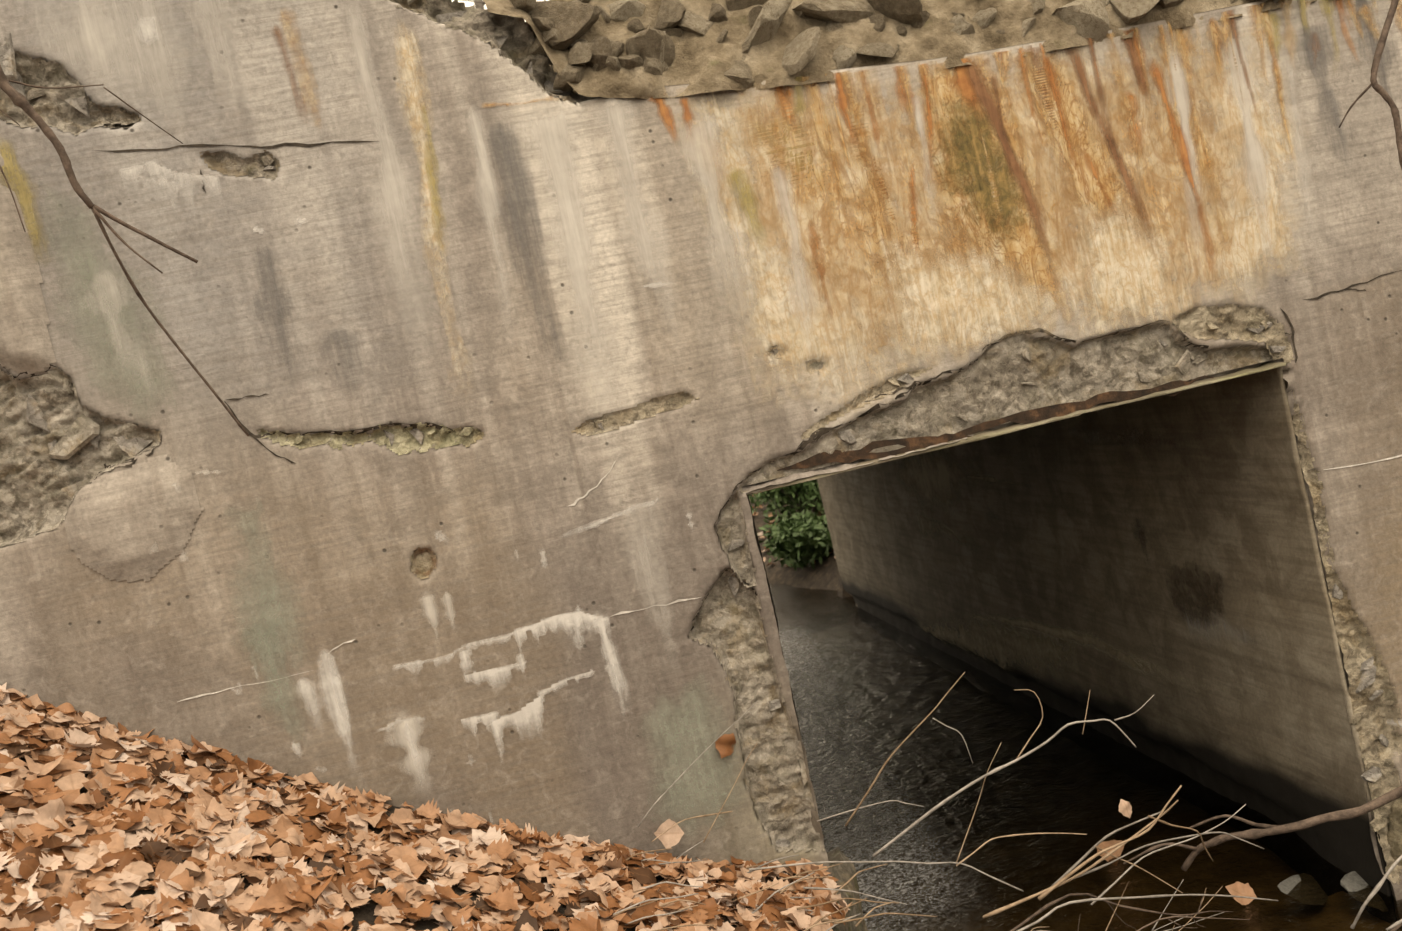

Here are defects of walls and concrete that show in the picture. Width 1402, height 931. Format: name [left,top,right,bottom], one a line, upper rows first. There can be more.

spalling [0,32,141,135]
corrosion [1210,10,1249,86]
corrosion [1251,3,1292,149]
spalling [199,149,280,180]
corrosion [651,72,917,247]
corrosion [896,23,1212,302]
spalling [0,367,161,547]
spalling [688,303,1295,853]
leakage [387,719,423,774]
leakage [462,651,524,680]
leakage [461,671,592,738]
leakage [499,611,621,681]